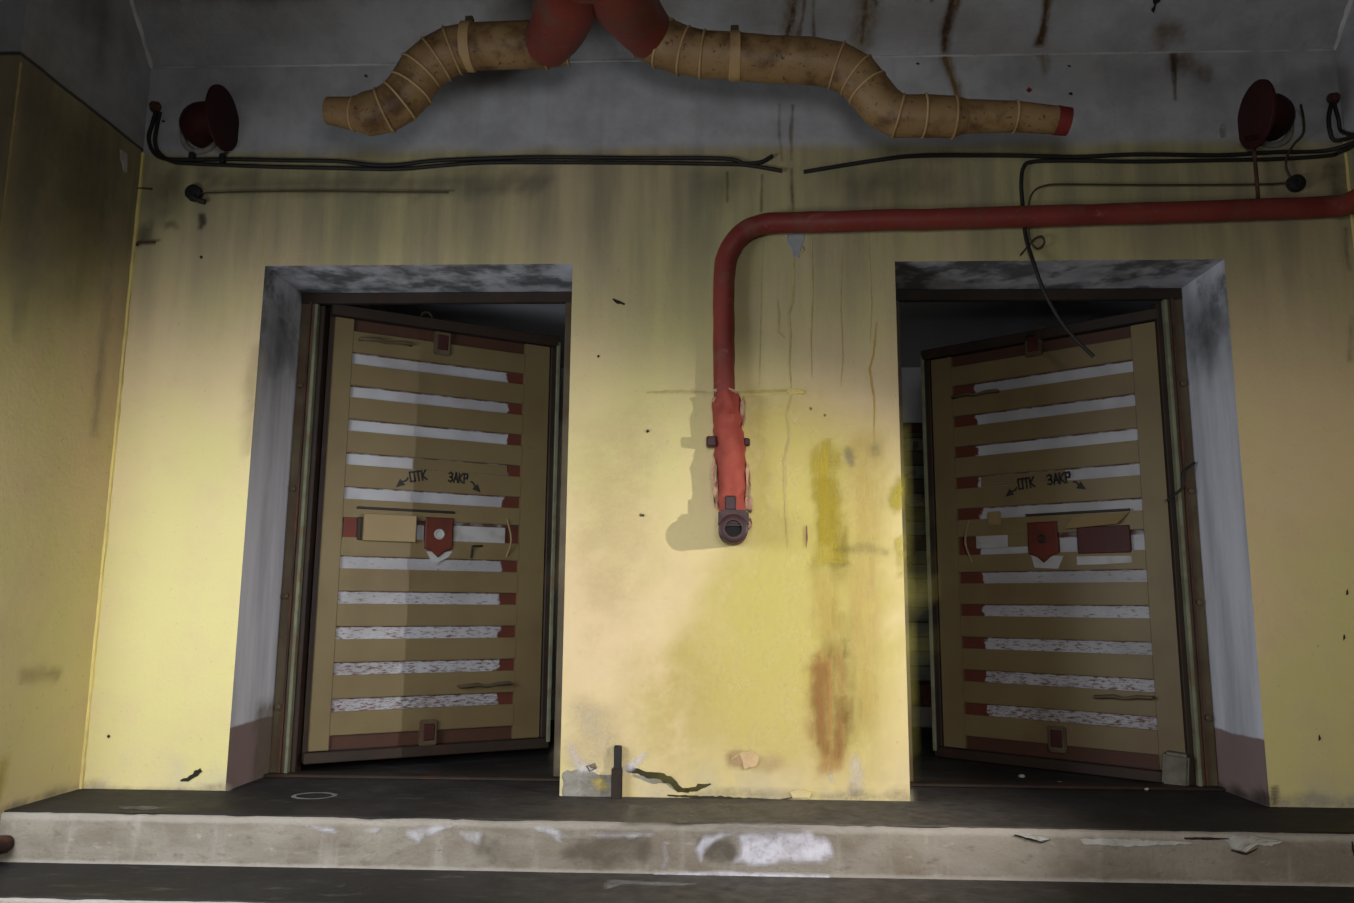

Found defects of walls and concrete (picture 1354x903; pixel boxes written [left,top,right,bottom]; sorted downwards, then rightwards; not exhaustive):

rust [942,0,961,97]
rust [1035,0,1051,46]
leakage [713,419,871,739]
rust [811,648,848,769]
crack [626,767,792,799]